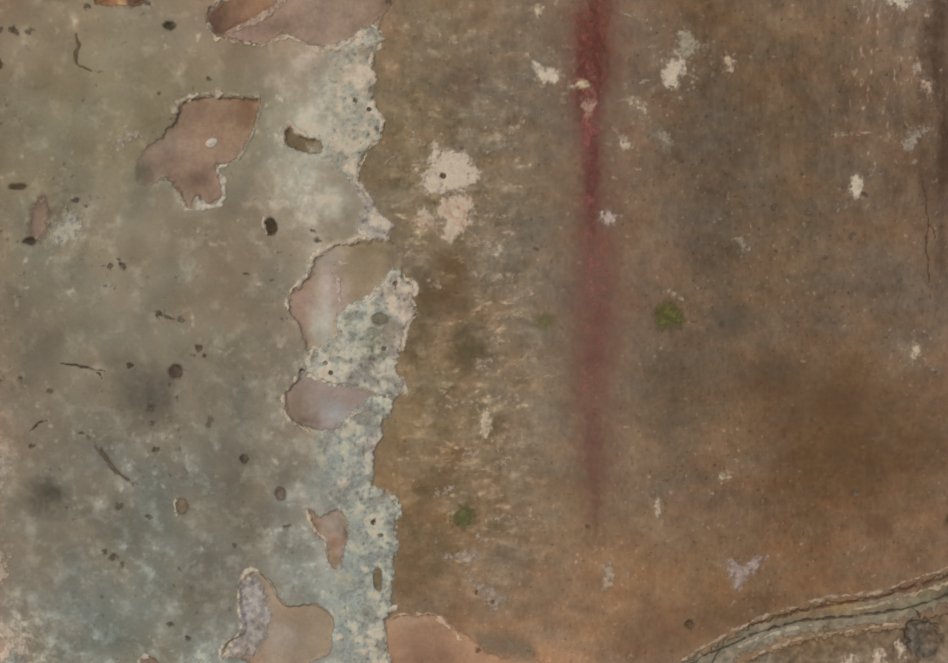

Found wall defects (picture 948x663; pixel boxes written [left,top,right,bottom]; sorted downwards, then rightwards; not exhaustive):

flaking render [84,0,150,8]
peeling [887,0,911,11]
flaking render [143,89,262,211]
peeling [206,0,539,663]
peeling [727,555,762,589]
flaking render [677,567,948,663]